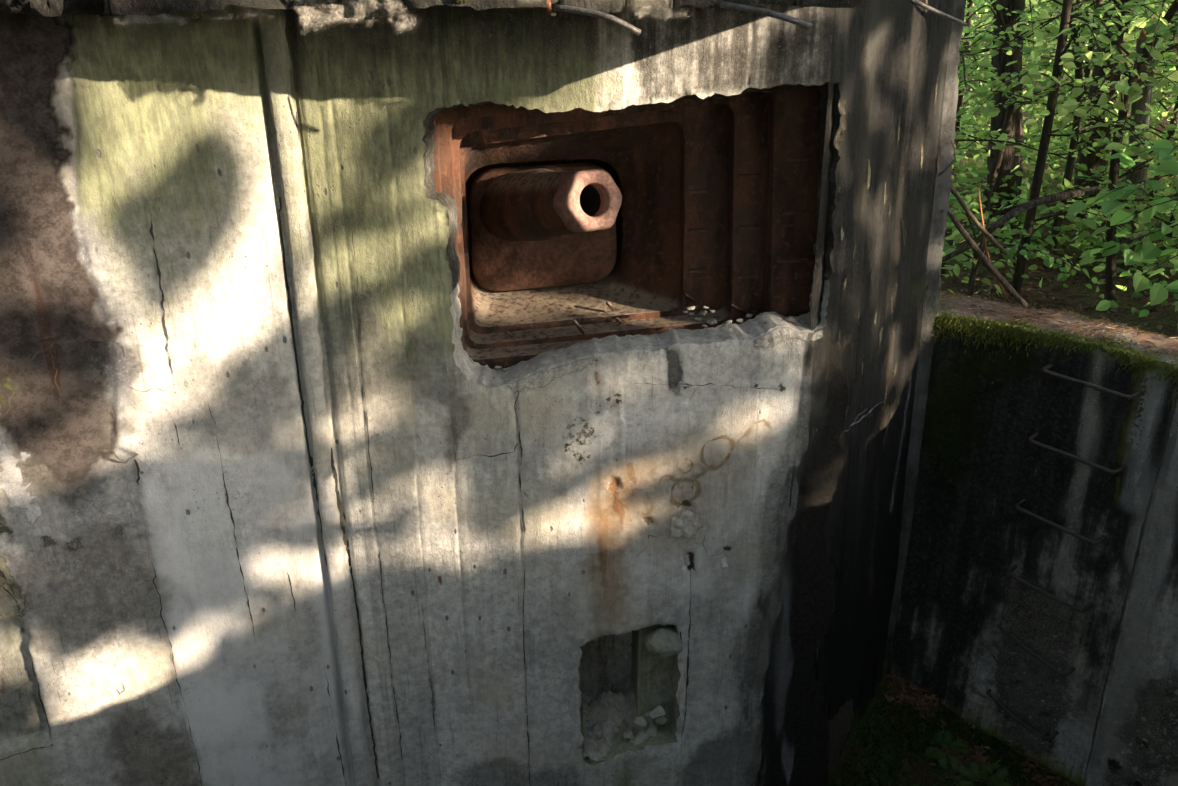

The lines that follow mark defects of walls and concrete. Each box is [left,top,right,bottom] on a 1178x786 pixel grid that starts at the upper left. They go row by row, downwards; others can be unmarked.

spalling [292,0,415,31]
spalling [0,515,12,534]
peeling [0,557,25,620]
crack [0,336,125,423]
damp [0,11,139,613]
crack [101,200,174,485]
crack [174,405,256,641]
crack [278,111,405,783]
corrosion [591,463,636,597]
damp [1044,352,1101,642]
damp [1100,360,1178,750]
damp [110,710,199,786]